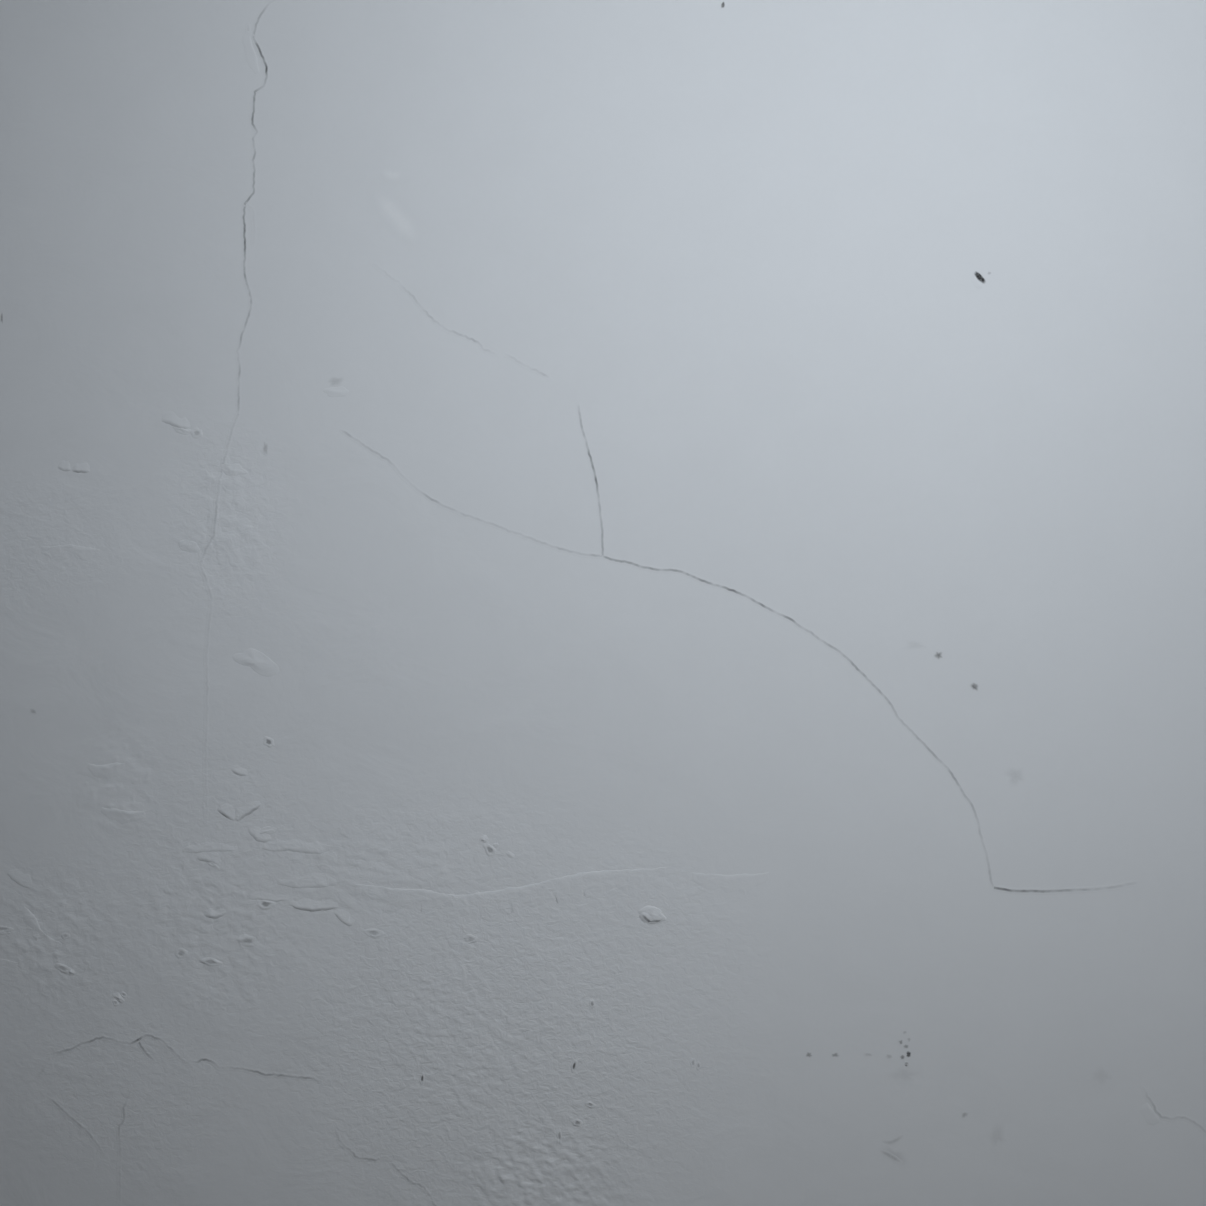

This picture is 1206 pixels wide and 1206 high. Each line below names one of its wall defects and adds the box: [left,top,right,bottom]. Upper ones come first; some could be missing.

crack [197,0,278,825]
crack [339,402,1139,895]